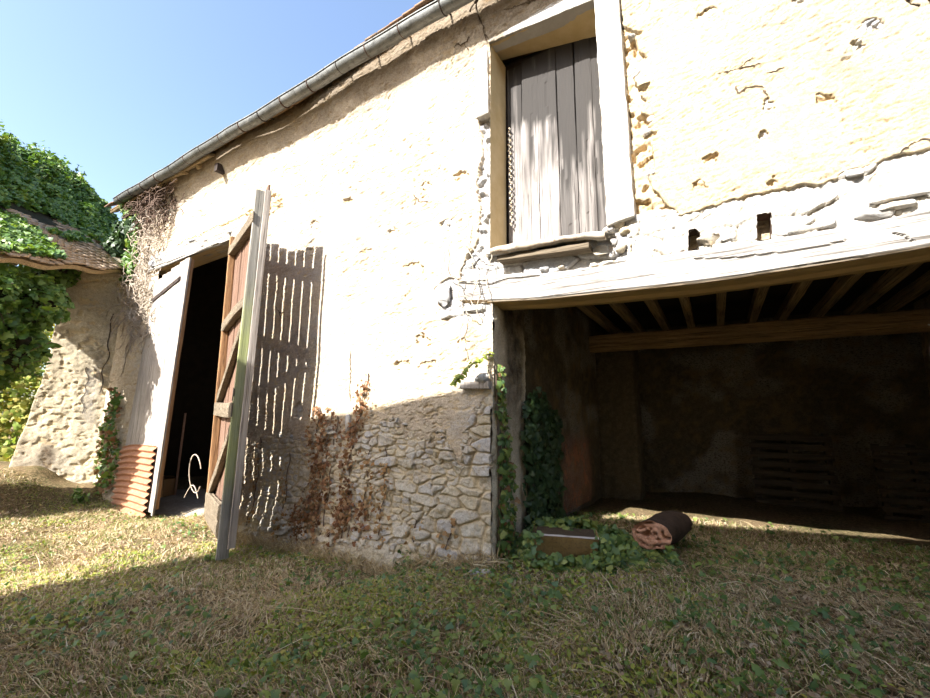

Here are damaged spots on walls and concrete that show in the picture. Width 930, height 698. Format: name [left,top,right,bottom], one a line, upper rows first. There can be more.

crack [454,0,489,50]
flaking render [434,150,930,323]